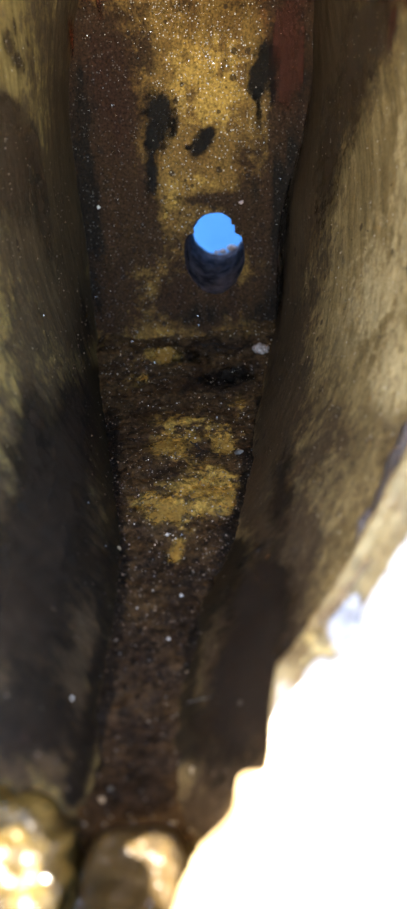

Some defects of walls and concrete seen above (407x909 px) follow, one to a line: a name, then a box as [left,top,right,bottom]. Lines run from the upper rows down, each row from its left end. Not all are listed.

damp [247,38,281,123]
damp [141,88,178,195]
damp [185,127,216,158]